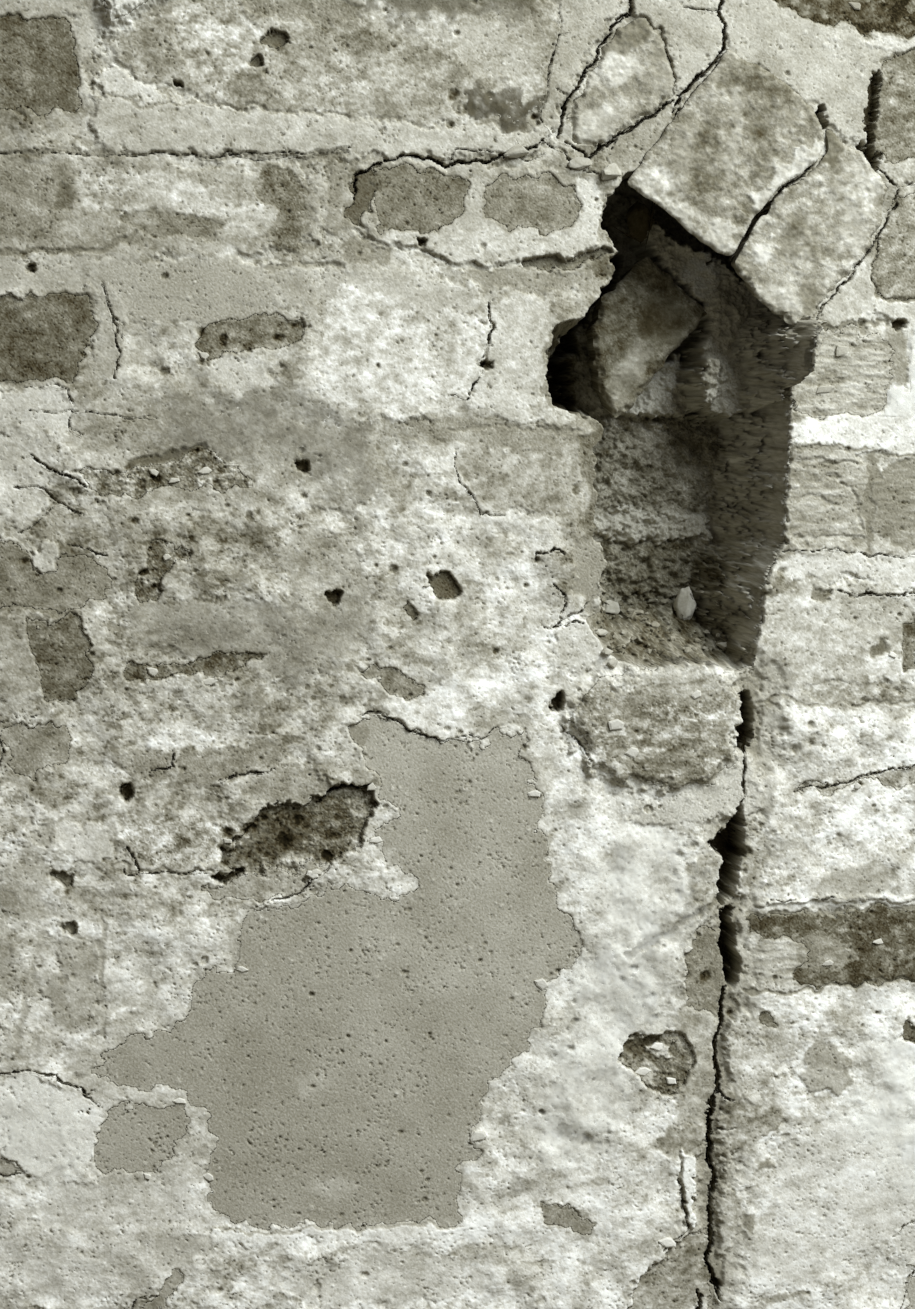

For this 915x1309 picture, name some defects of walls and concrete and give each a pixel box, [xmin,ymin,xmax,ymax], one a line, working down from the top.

crack [353,0,727,200]
crack [729,164,813,261]
crack [816,166,908,319]
spalling [545,176,895,674]
crack [739,736,747,803]
peeling [91,715,583,1231]
spalling [618,1031,695,1095]
crack [663,987,735,1309]